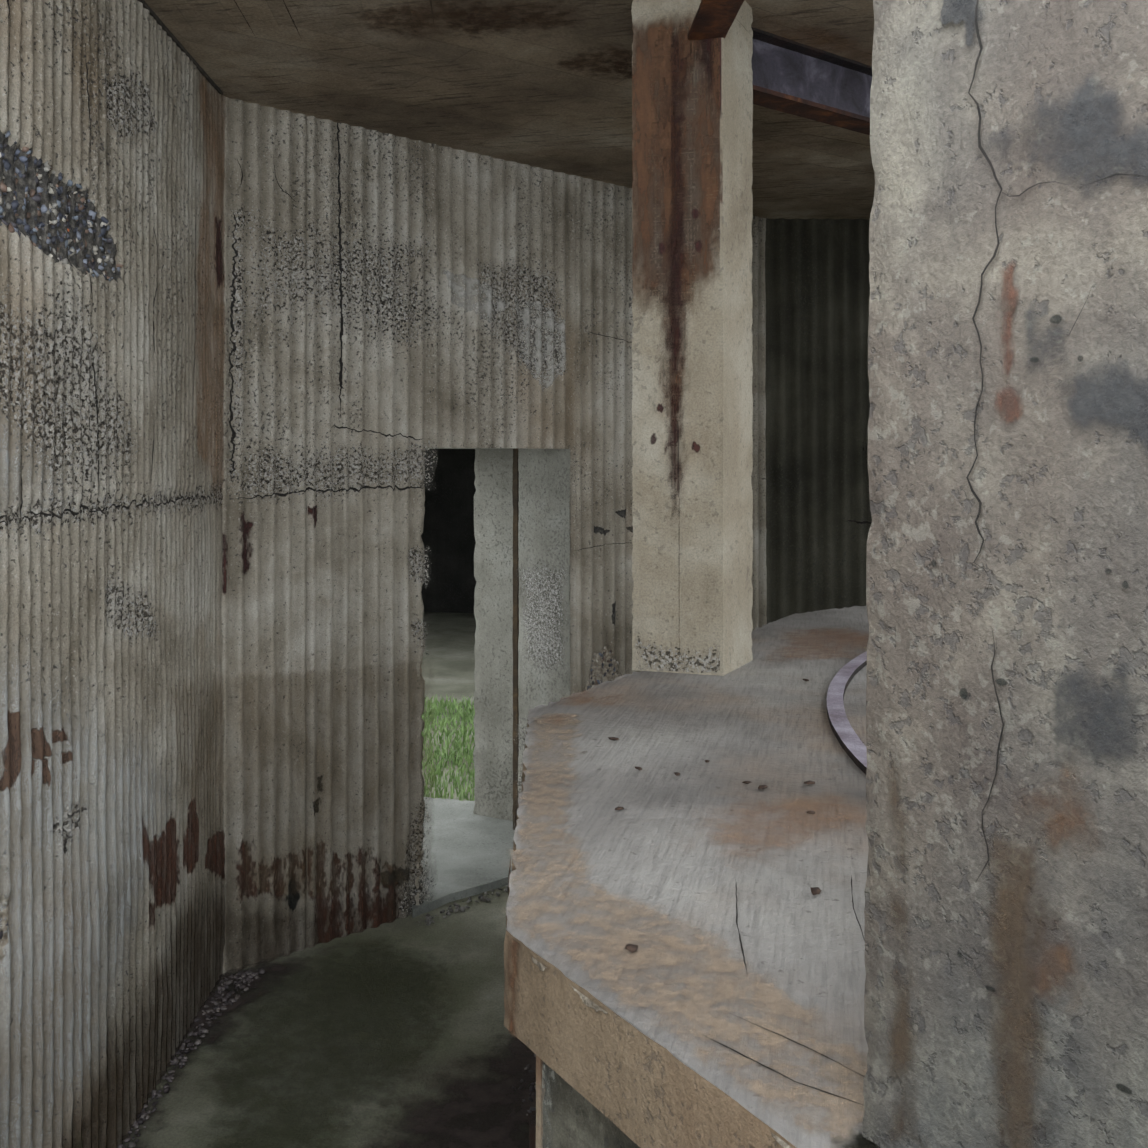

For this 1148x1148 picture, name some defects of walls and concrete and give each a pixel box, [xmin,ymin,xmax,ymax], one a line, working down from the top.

spalling [0,130,124,282]
rust [558,18,723,490]
crack [966,0,1148,598]
crack [17,436,25,520]
rust [0,710,73,791]
crack [975,631,1004,883]
rust [141,798,401,943]